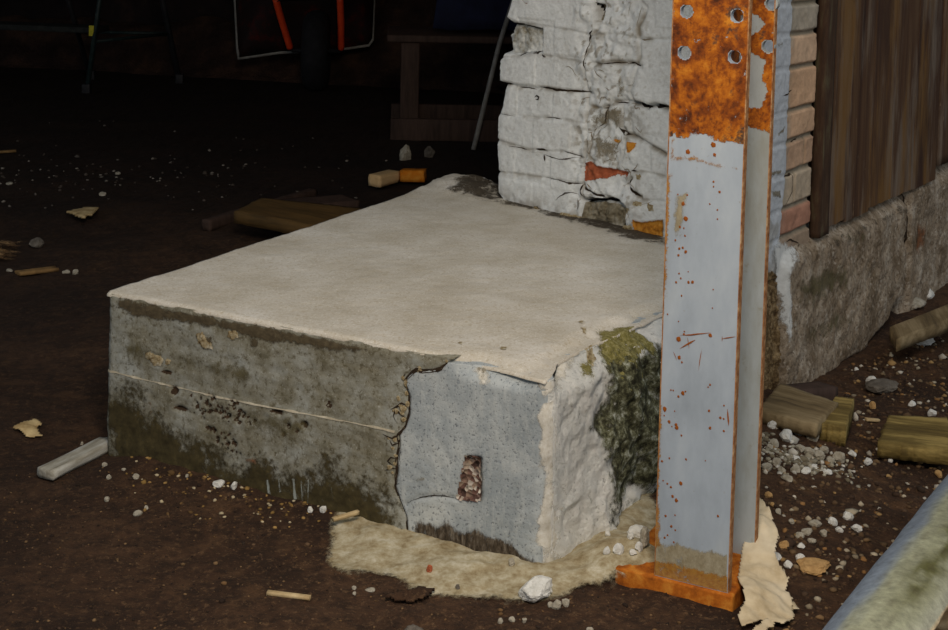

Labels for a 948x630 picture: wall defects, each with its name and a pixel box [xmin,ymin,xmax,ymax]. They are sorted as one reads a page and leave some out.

crack [509,31,669,217]
flaking render [585,161,641,181]
rust [654,0,778,594]
damp [107,382,401,525]
crack [383,363,453,530]
damp [415,522,534,563]